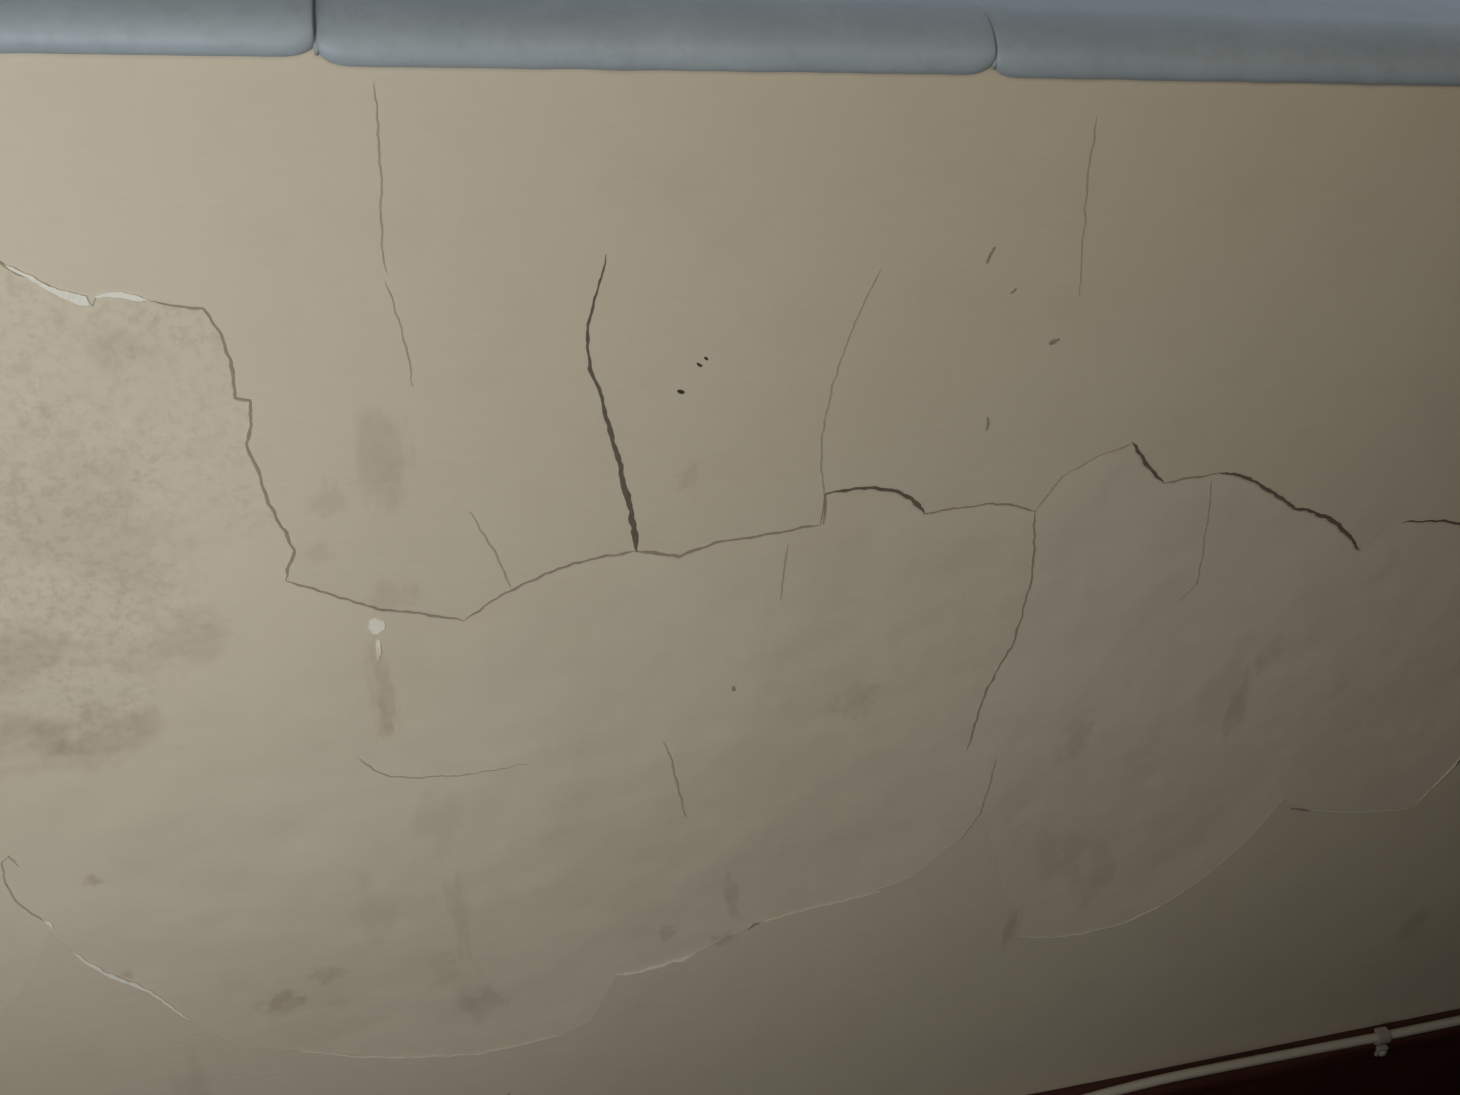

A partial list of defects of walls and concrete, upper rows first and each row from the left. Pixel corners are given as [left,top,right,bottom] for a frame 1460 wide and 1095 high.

crack [373,84,413,387]
crack [1079,115,1097,296]
crack [152,254,1360,844]
crack [1406,518,1460,526]